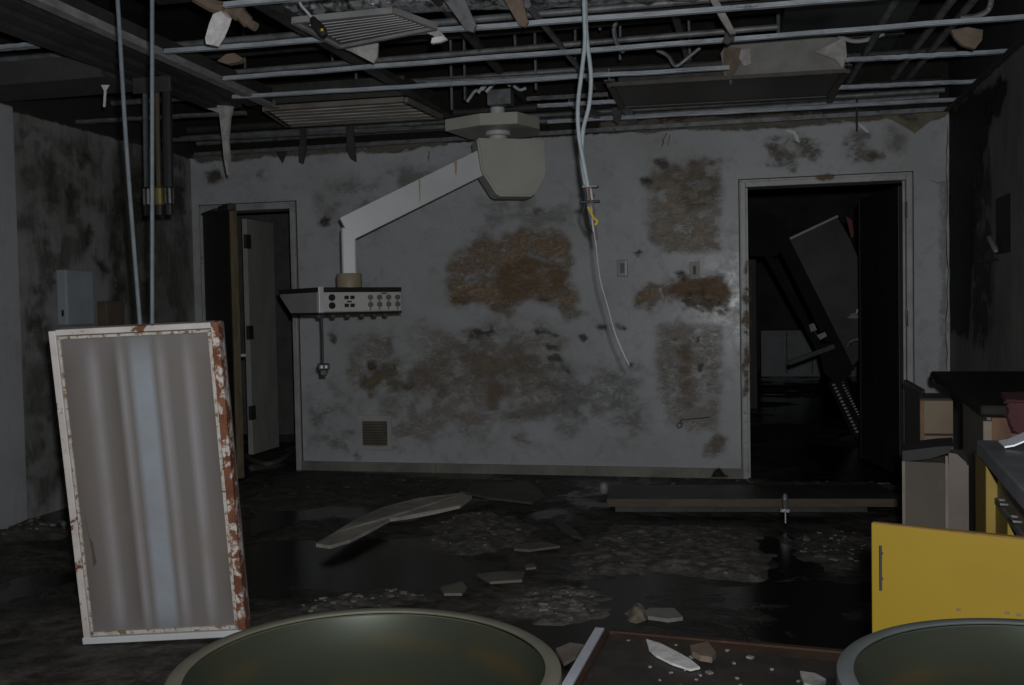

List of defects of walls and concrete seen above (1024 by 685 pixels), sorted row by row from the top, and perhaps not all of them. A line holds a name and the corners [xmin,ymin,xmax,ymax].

leakage [18,139,188,504]
spalling [194,140,447,163]
leakage [349,328,640,439]
flaking render [600,76,1007,347]